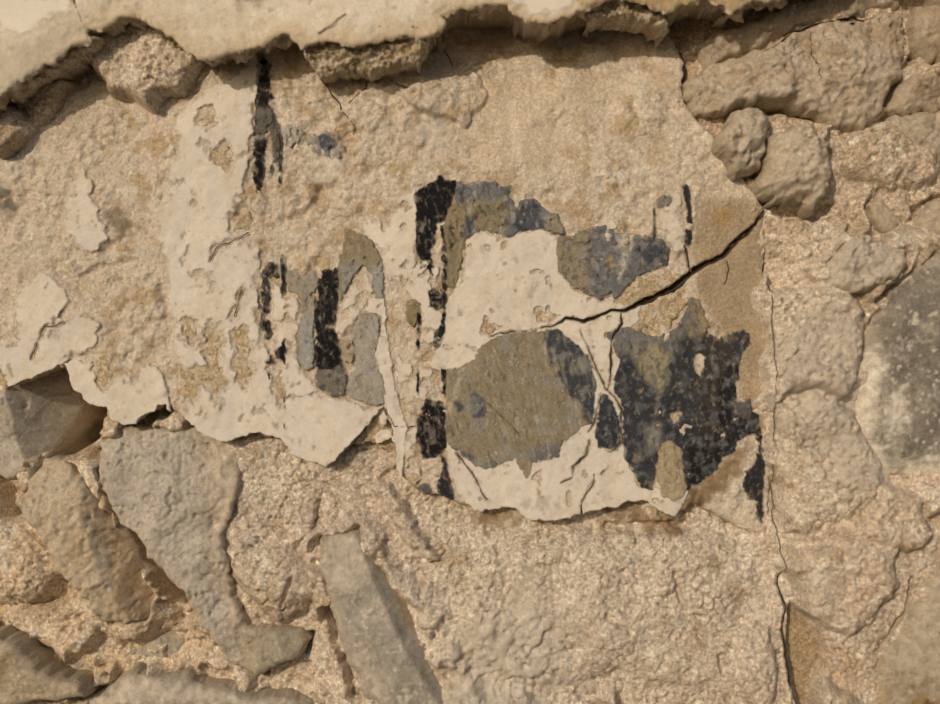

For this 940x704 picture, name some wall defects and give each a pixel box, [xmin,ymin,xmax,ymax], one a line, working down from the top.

spalling [10,35,106,106]
spalling [304,25,433,85]
peeling [0,55,765,523]
crack [490,210,796,704]